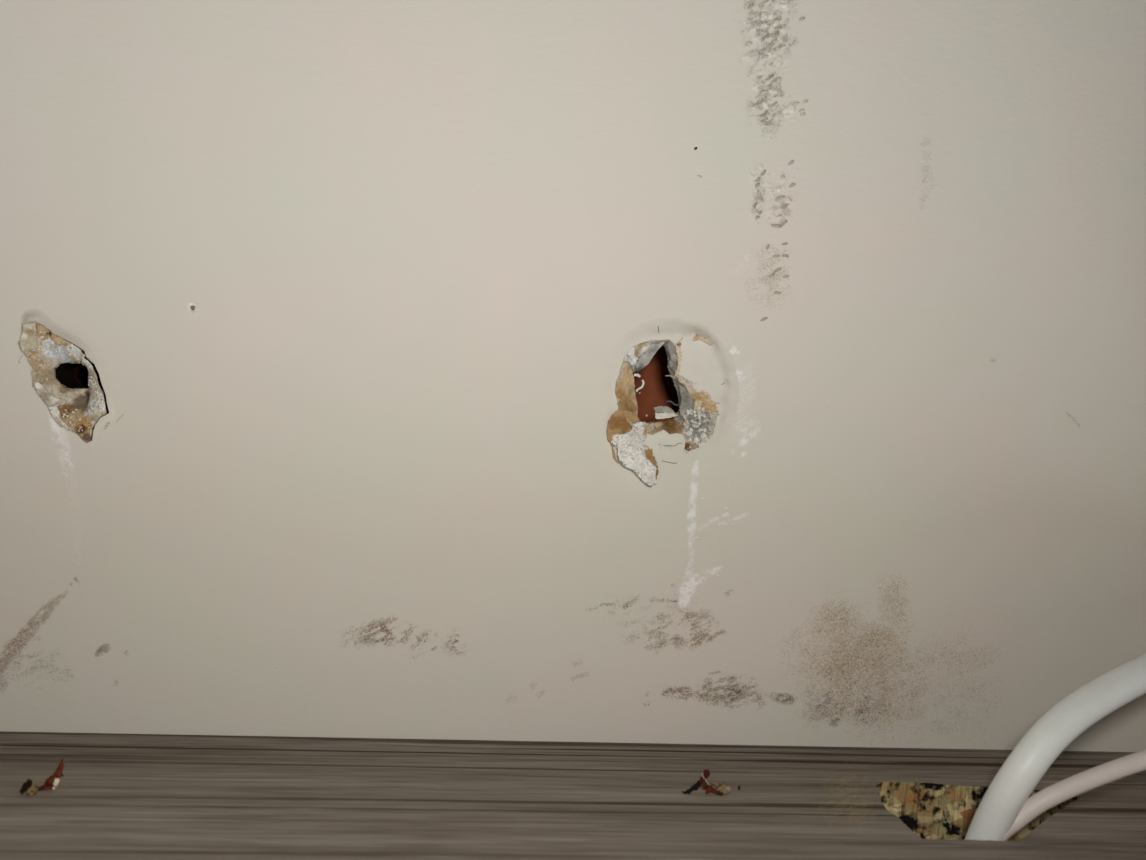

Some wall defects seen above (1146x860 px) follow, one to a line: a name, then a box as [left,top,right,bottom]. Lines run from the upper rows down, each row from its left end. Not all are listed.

peeling [738,0,808,143]
peeling [747,160,803,229]
flaking render [654,406,678,419]